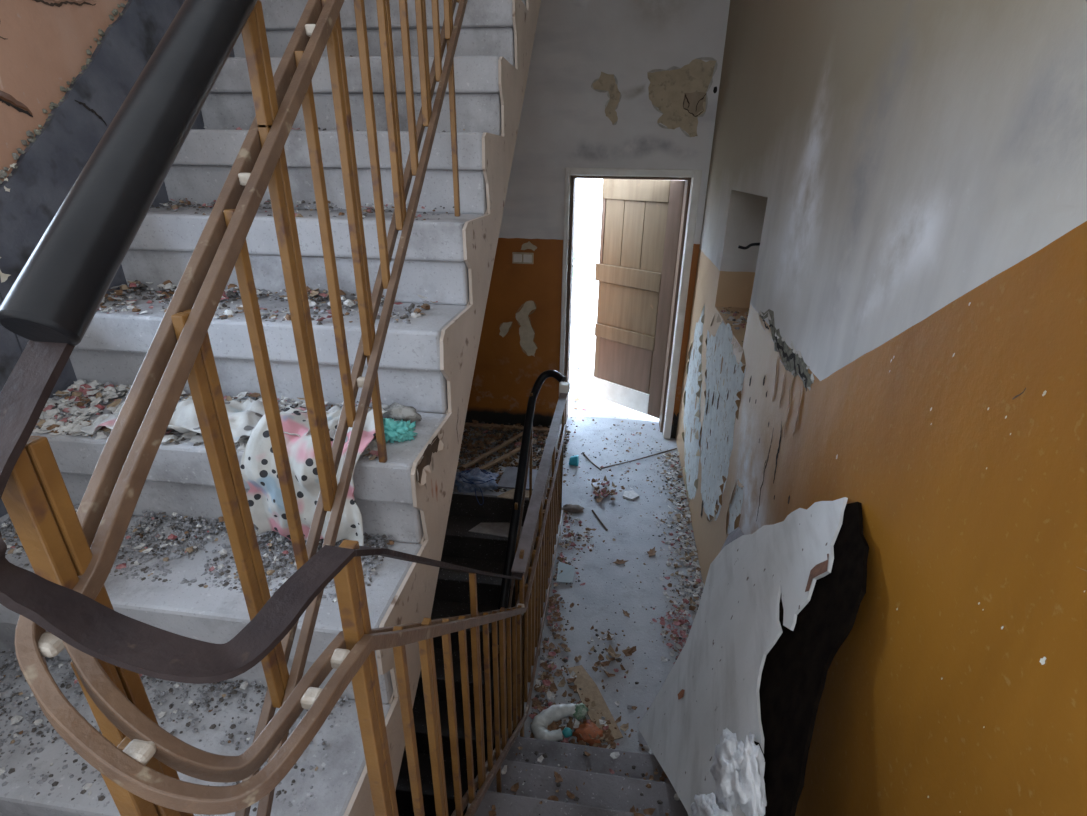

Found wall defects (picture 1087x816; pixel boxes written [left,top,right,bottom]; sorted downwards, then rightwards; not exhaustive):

crack [33,0,96,8]
spalling [0,0,130,192]
spalling [591,72,621,125]
spalling [647,57,718,137]
peeling [499,301,538,357]
spalling [759,309,814,392]
spalling [416,433,444,488]
peeling [682,305,746,536]